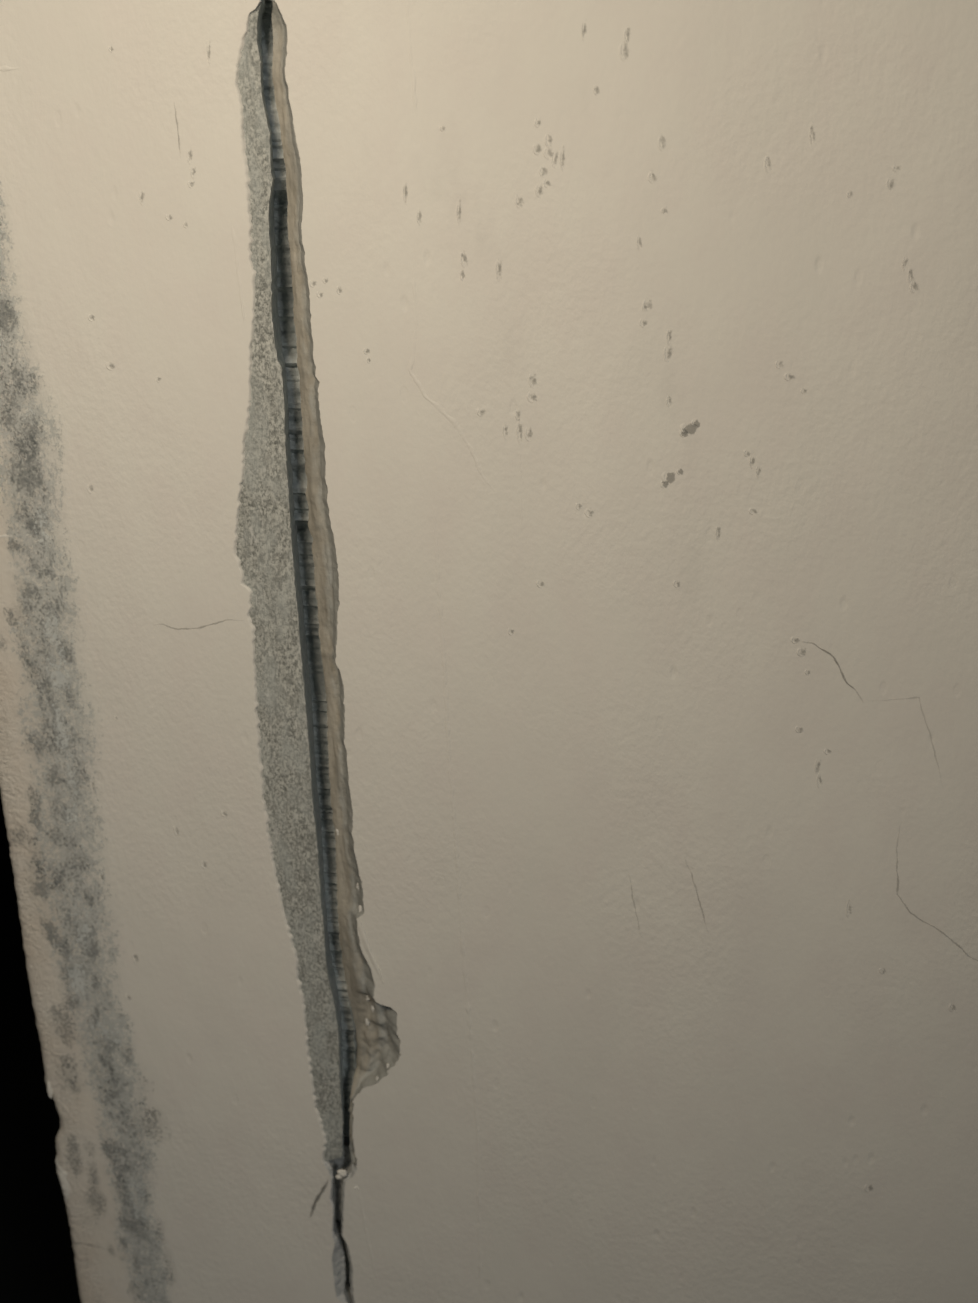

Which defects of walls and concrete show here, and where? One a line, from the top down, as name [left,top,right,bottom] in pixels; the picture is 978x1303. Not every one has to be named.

flaking render [231,0,343,1164]
crack [257,0,401,1303]